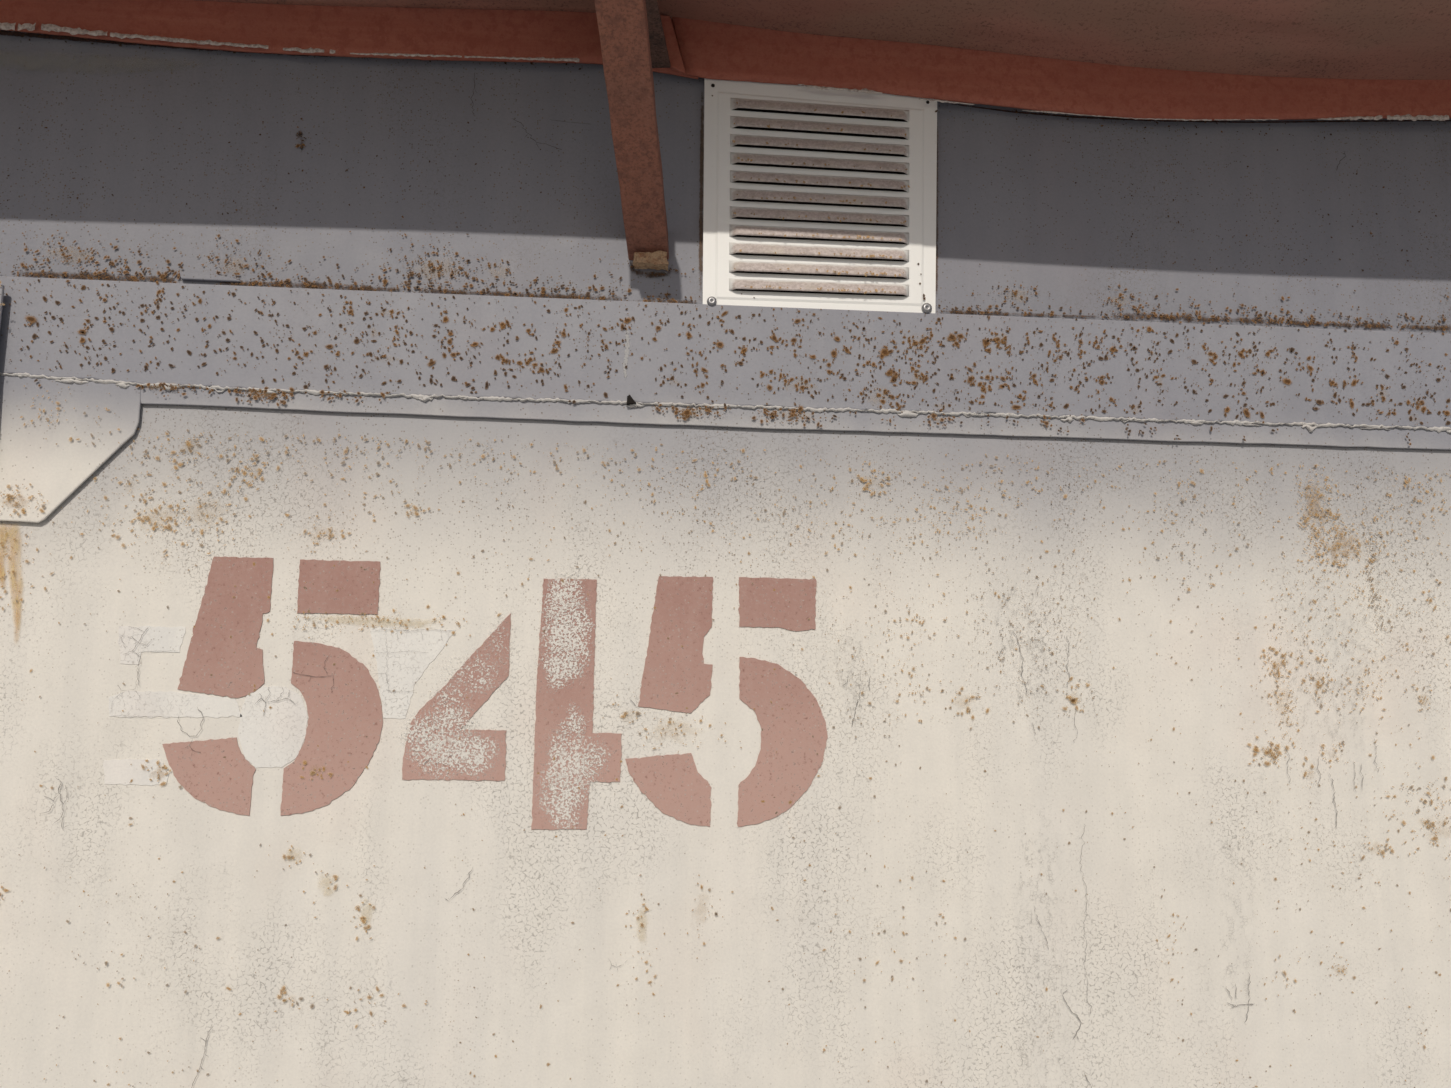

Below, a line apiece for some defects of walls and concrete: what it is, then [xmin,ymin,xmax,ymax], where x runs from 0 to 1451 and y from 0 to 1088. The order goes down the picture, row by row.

corrosion [0,30,335,57]
corrosion [66,871,220,1000]